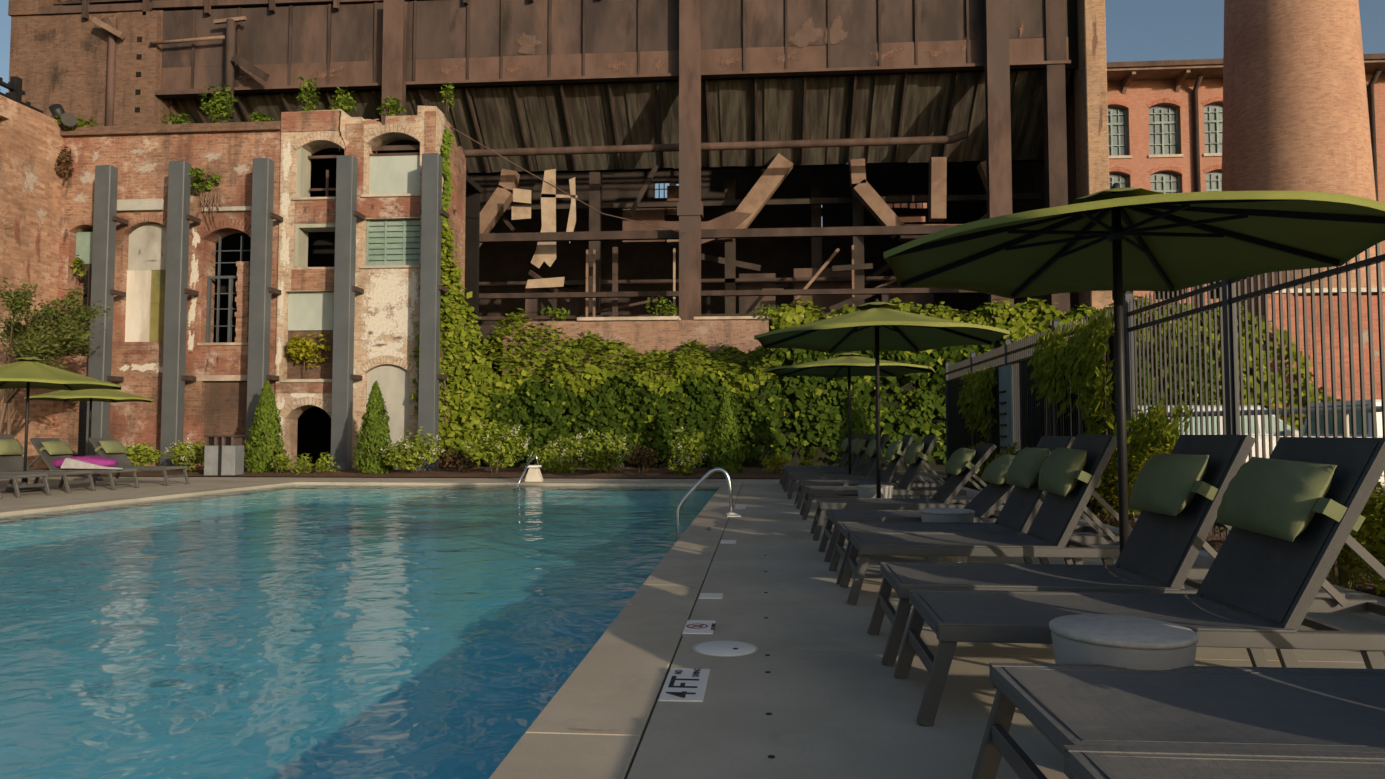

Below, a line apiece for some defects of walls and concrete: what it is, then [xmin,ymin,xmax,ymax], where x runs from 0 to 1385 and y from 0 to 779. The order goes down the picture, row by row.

peeling [353,264,420,392]